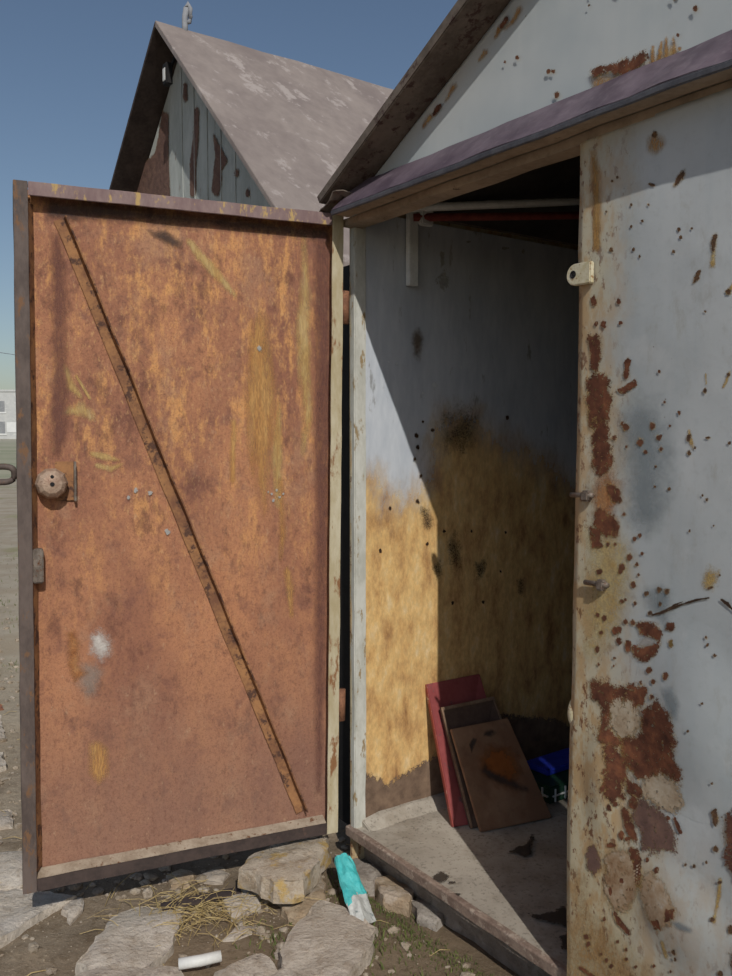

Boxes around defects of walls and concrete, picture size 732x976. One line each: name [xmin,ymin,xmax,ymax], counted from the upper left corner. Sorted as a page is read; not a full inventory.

rust [590,33,681,86]
rust [53,236,91,452]
rust [298,237,330,753]
rust [583,321,675,699]
rust [366,418,576,788]
rust [703,572,721,589]
leakage [365,753,444,818]
leakage [500,712,570,760]
rust [568,845,642,976]
peeling [588,677,686,932]
rust [710,879,722,923]
peeling [711,808,732,872]